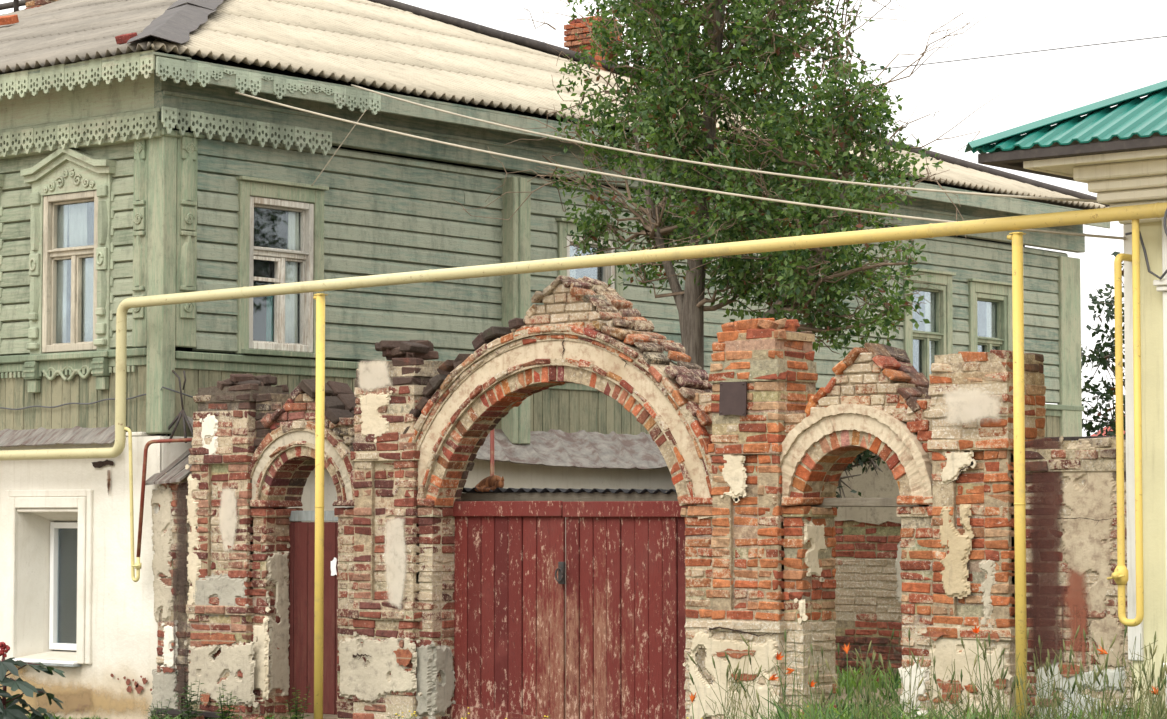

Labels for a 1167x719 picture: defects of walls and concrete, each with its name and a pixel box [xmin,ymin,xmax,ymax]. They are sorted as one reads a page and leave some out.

damp [1032,438,1060,449]
damp [1030,472,1065,676]
spalling [184,632,236,646]
spalling [921,625,961,641]
spalling [393,640,421,667]
peeling [110,673,152,694]